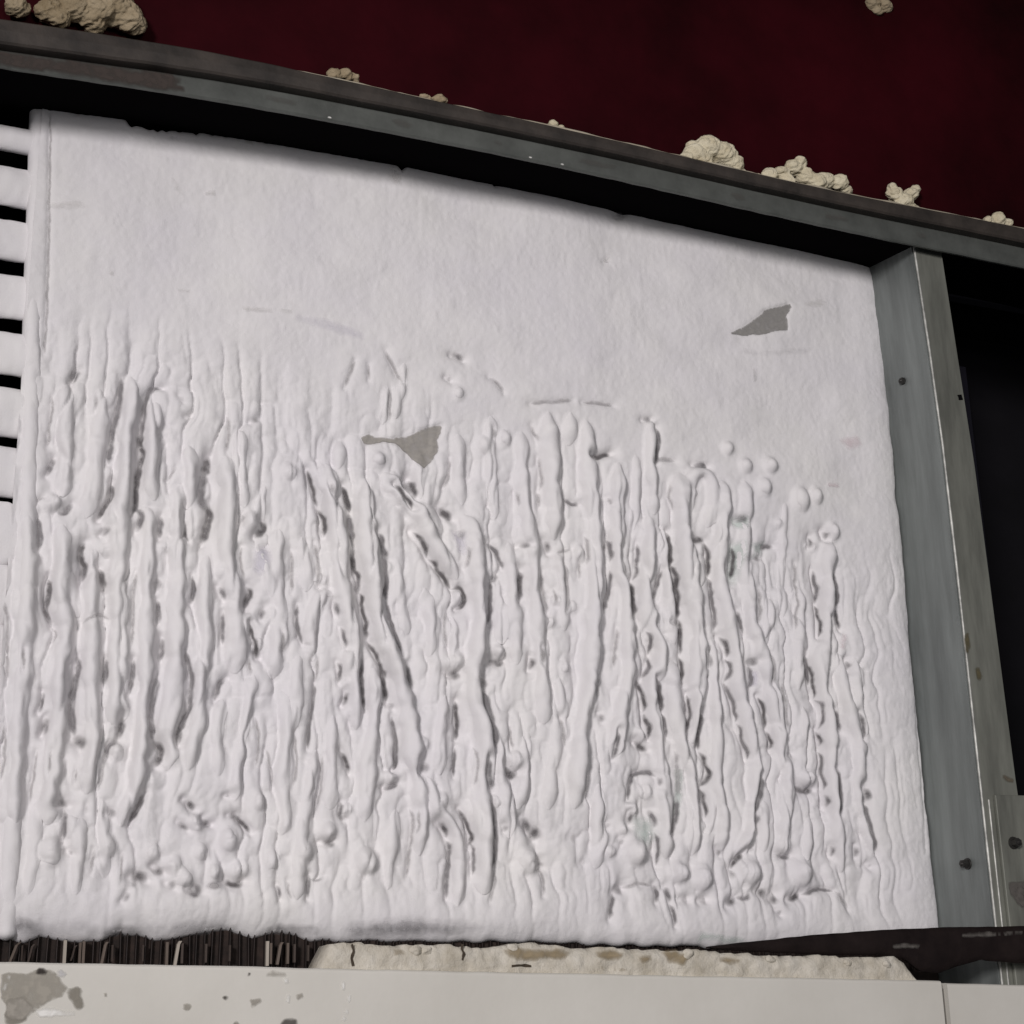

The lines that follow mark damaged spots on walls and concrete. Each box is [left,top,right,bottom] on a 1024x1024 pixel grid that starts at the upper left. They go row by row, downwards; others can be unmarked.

peeling [731,304,791,335]
peeling [362,426,441,468]
peeling [1,970,83,1024]